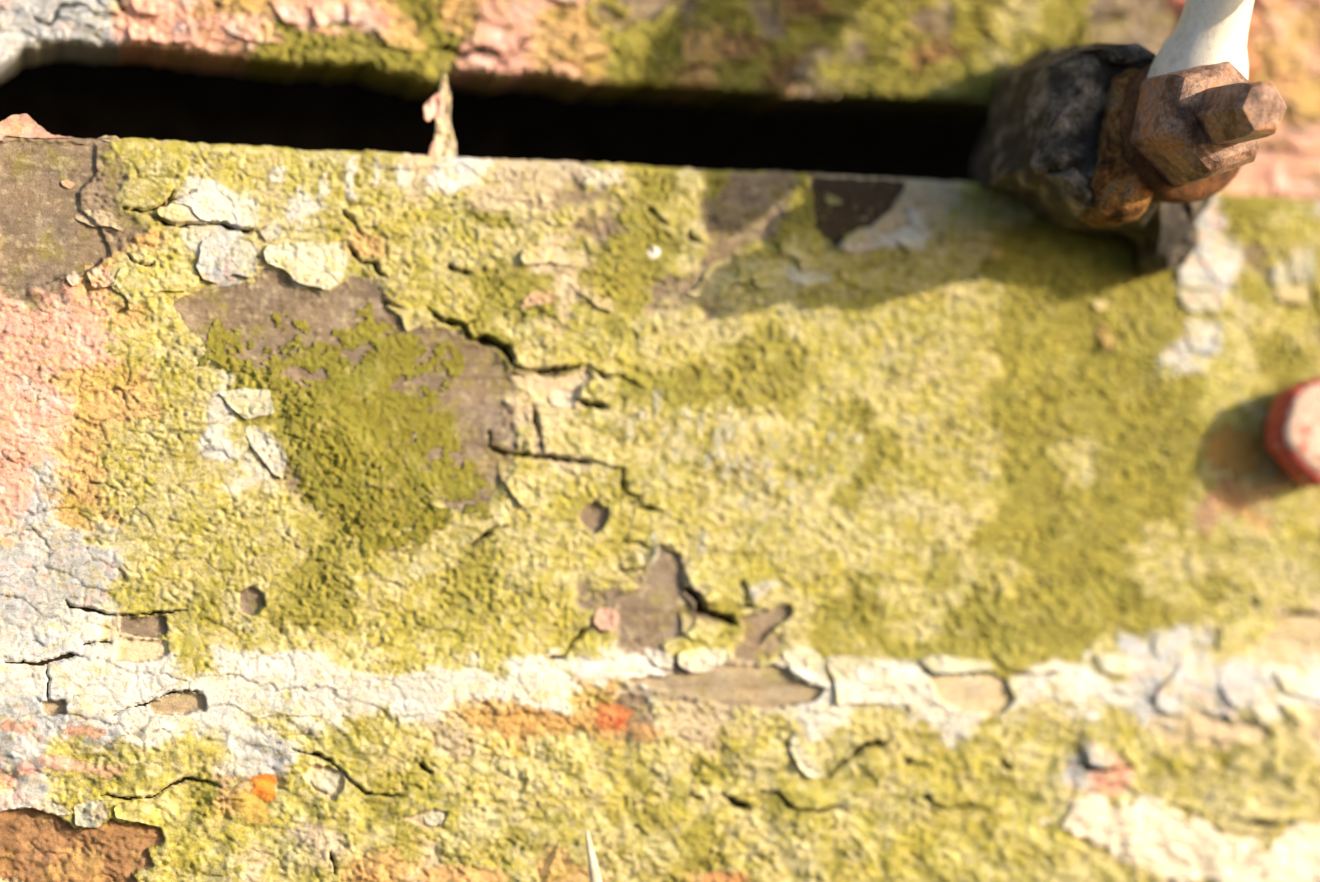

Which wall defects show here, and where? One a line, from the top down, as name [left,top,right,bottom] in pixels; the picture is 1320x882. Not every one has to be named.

peeling [456,29,520,72]
peeling [689,176,905,300]
peeling [0,114,593,513]
crack [431,312,638,410]
crack [488,405,662,512]
crack [471,526,503,547]
crack [620,541,672,572]
peeling [594,547,1014,716]
peeling [1097,611,1320,744]
crack [1249,599,1320,618]
crack [693,740,989,813]
spalling [1038,789,1320,882]